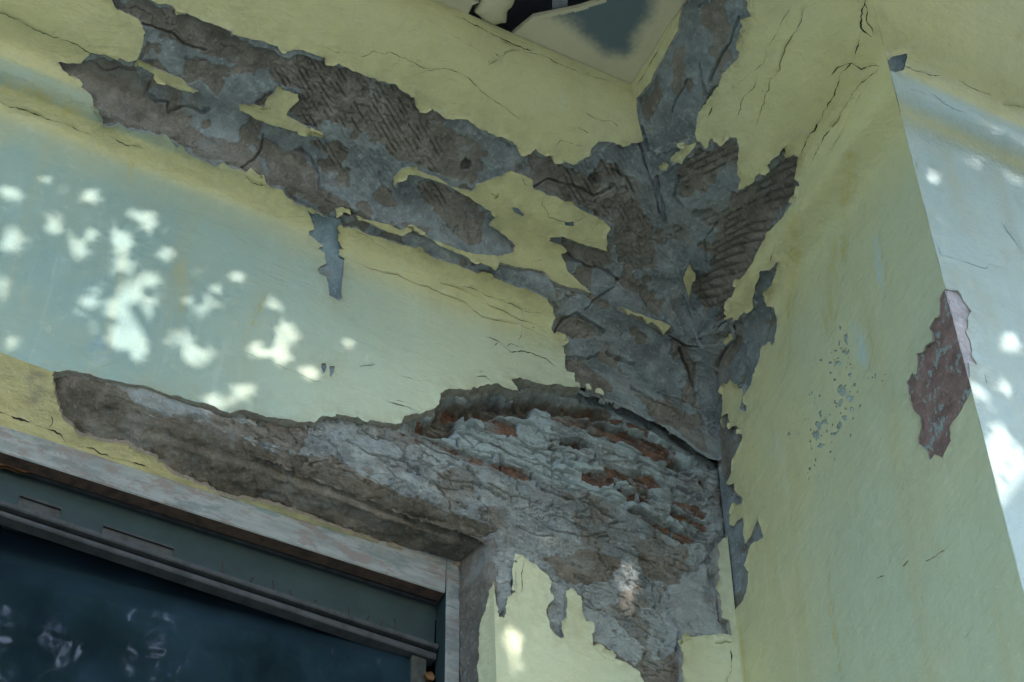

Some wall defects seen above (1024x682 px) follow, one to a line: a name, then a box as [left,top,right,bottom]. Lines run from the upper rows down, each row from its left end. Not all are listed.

crack [0,5,121,61]
crack [324,9,617,129]
crack [733,0,816,125]
crack [794,0,1024,167]
crack [0,412,163,476]
flaking render [54,0,800,682]
crack [345,252,561,369]
peeling [809,327,861,470]
peeling [909,290,976,459]